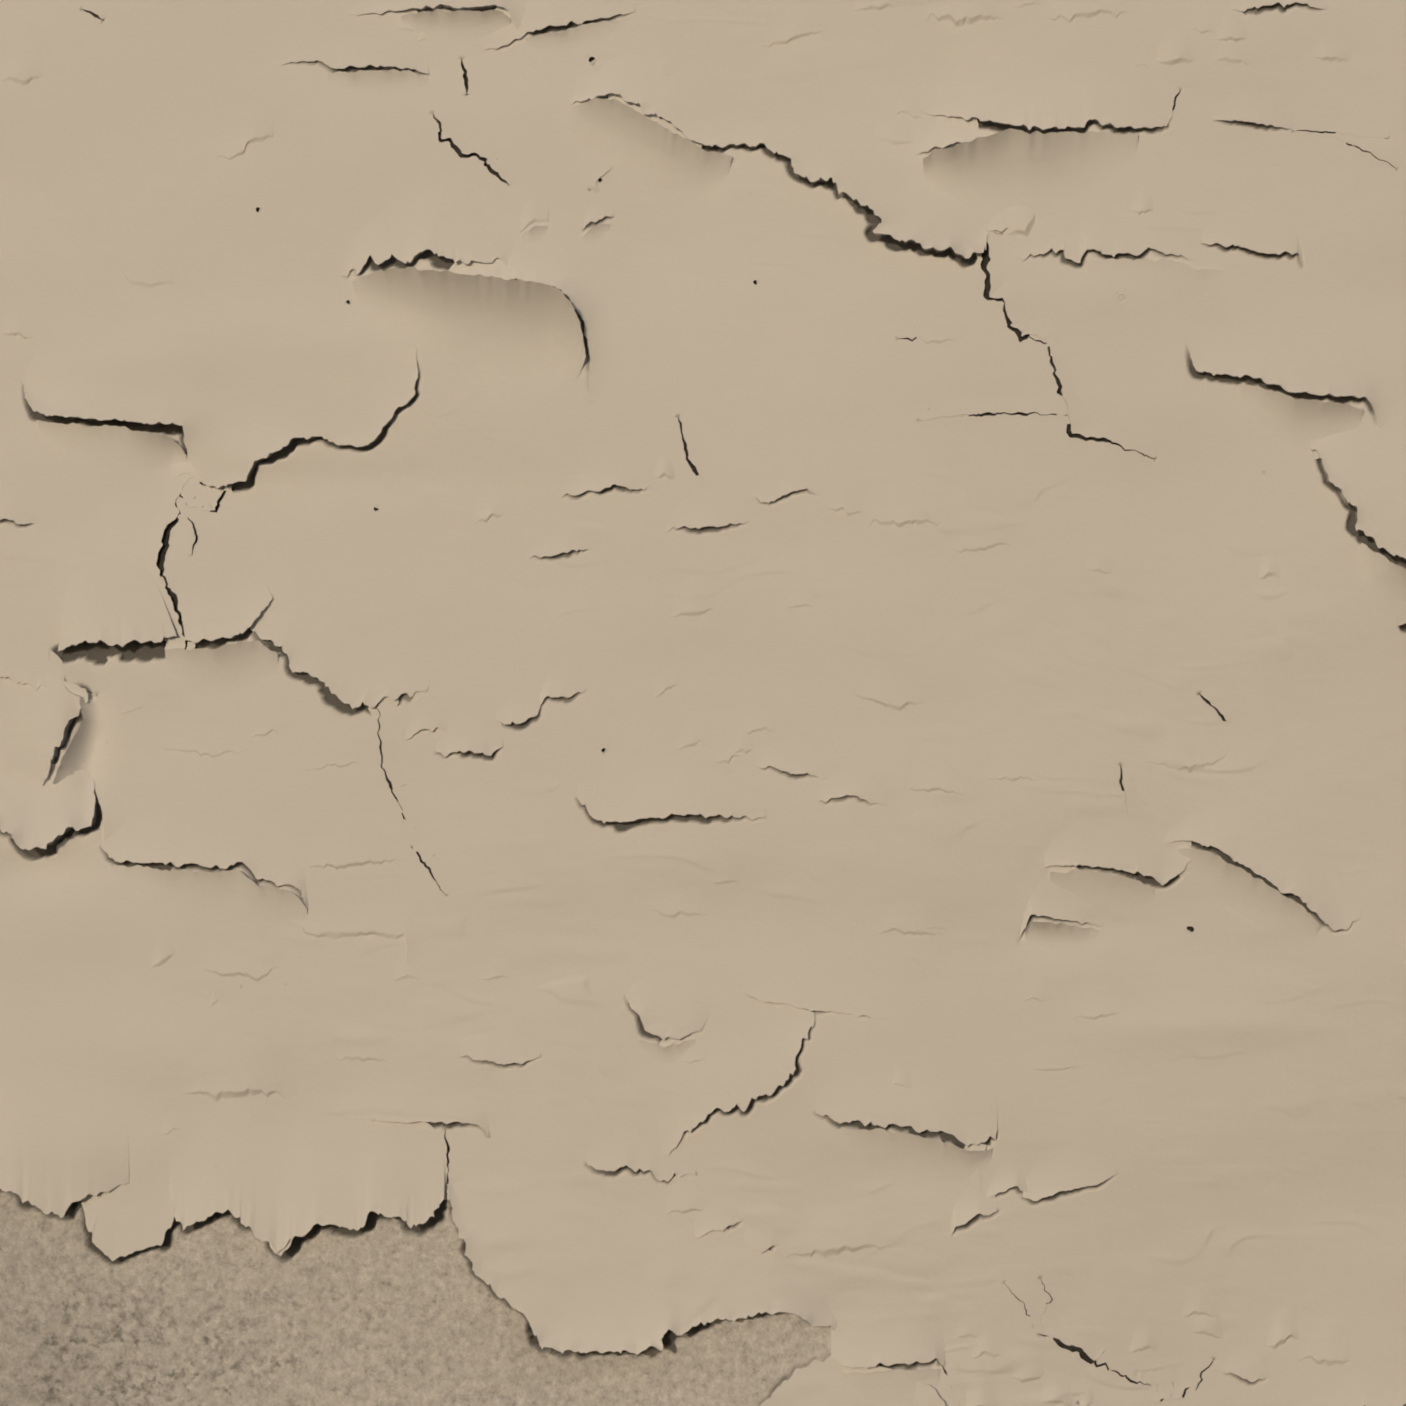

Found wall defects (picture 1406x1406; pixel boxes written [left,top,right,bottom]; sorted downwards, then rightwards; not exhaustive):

crack [898,323,959,347]
crack [919,226,1159,465]
peeling [0,0,1364,964]
peeling [1187,322,1406,626]
flaking render [0,1017,967,1406]
peeling [587,971,901,1182]
peeling [815,1041,1117,1237]